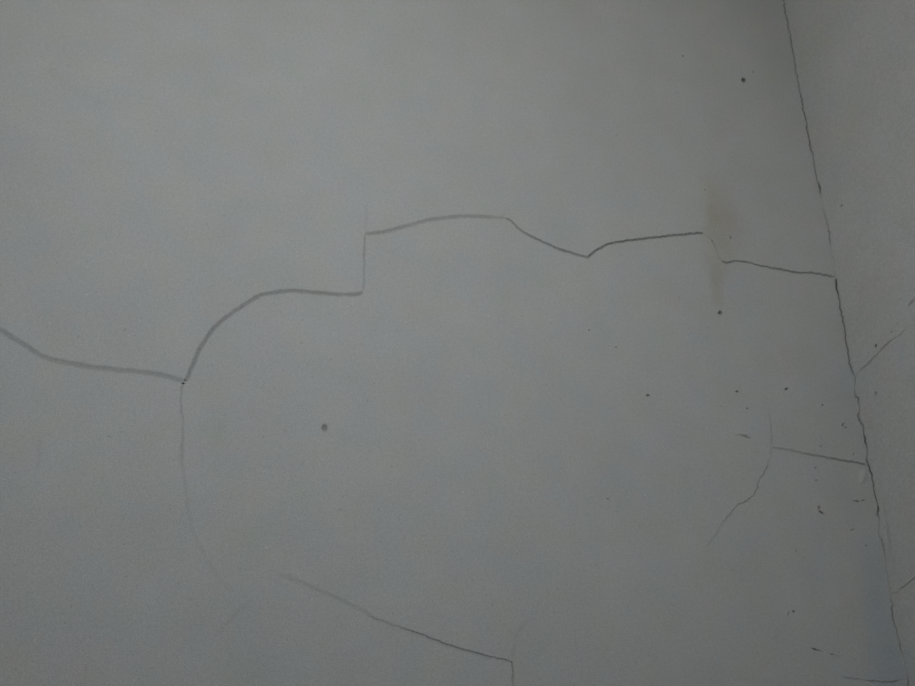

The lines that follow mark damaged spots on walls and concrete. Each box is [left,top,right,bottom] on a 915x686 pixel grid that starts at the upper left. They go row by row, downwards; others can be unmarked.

crack [721,259,838,292]
crack [0,213,703,592]
crack [707,439,872,546]
crack [277,572,515,686]